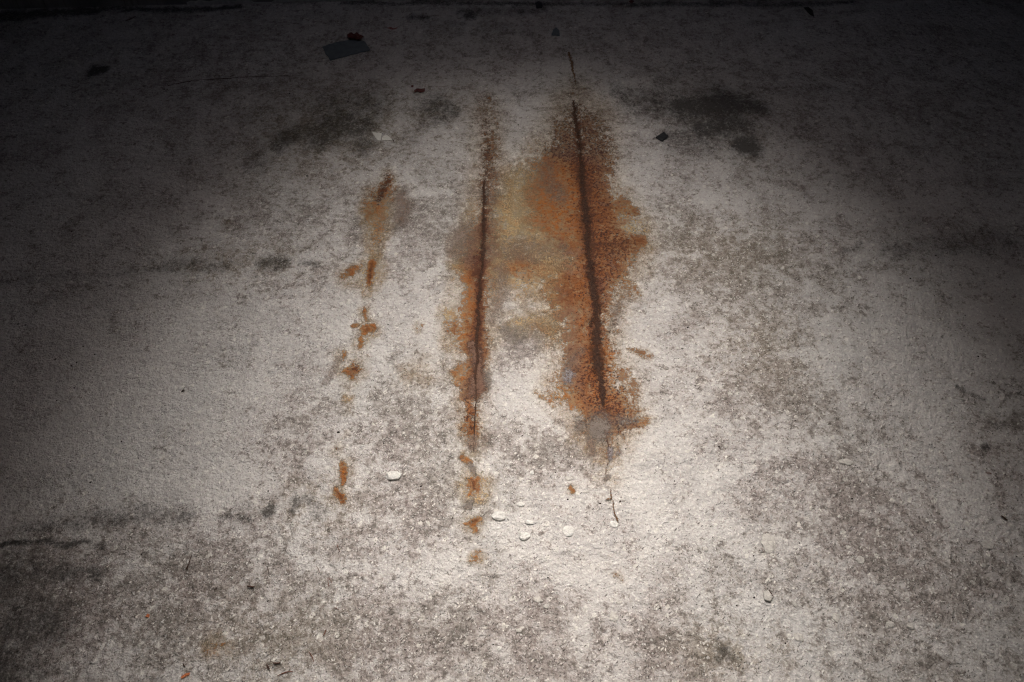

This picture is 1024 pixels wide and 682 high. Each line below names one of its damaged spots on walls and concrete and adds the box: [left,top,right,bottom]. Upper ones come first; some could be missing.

corrosion [323,169,413,381]
crack [473,180,487,450]
corrosion [443,79,654,534]
crack [568,52,606,406]
corrosion [331,447,349,505]